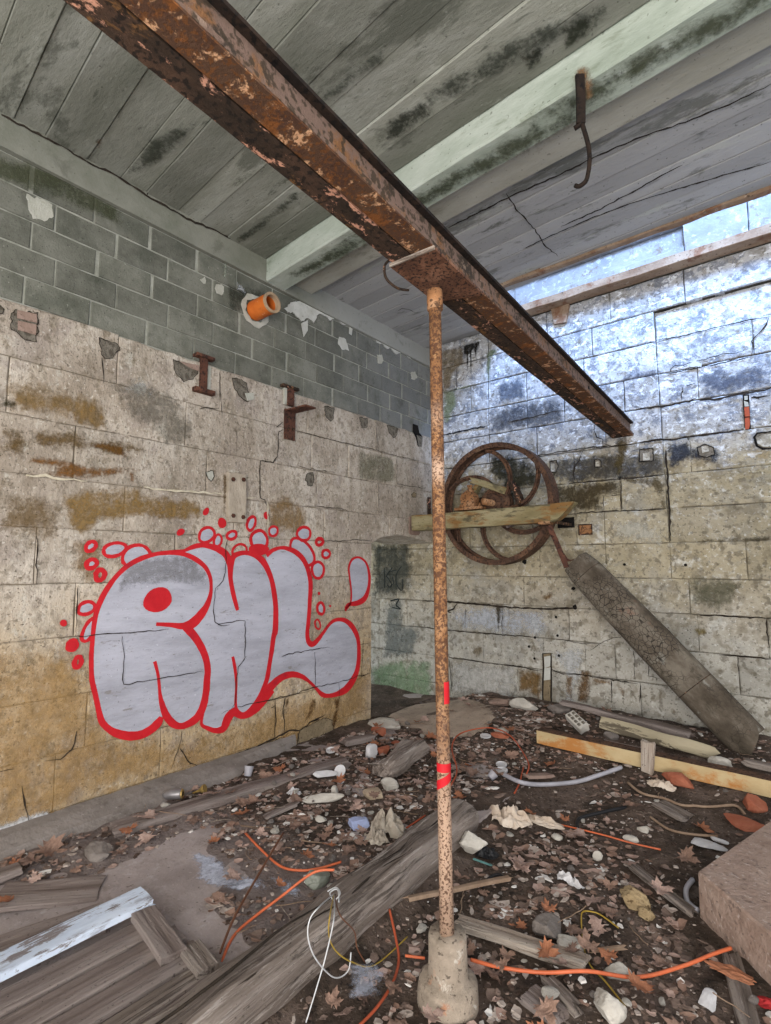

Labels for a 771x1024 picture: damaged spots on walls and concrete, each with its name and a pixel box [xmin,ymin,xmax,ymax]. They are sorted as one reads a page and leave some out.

water stain [387,0,765,204]
crack [1,114,230,239]
water stain [132,129,185,171]
crack [448,84,771,255]
water stain [294,234,365,274]
spalling [0,305,39,342]
spalling [99,337,120,359]
spalling [173,359,199,382]
peeling [263,292,363,337]
water stain [4,386,139,454]
crack [236,420,422,542]
crack [213,540,371,753]